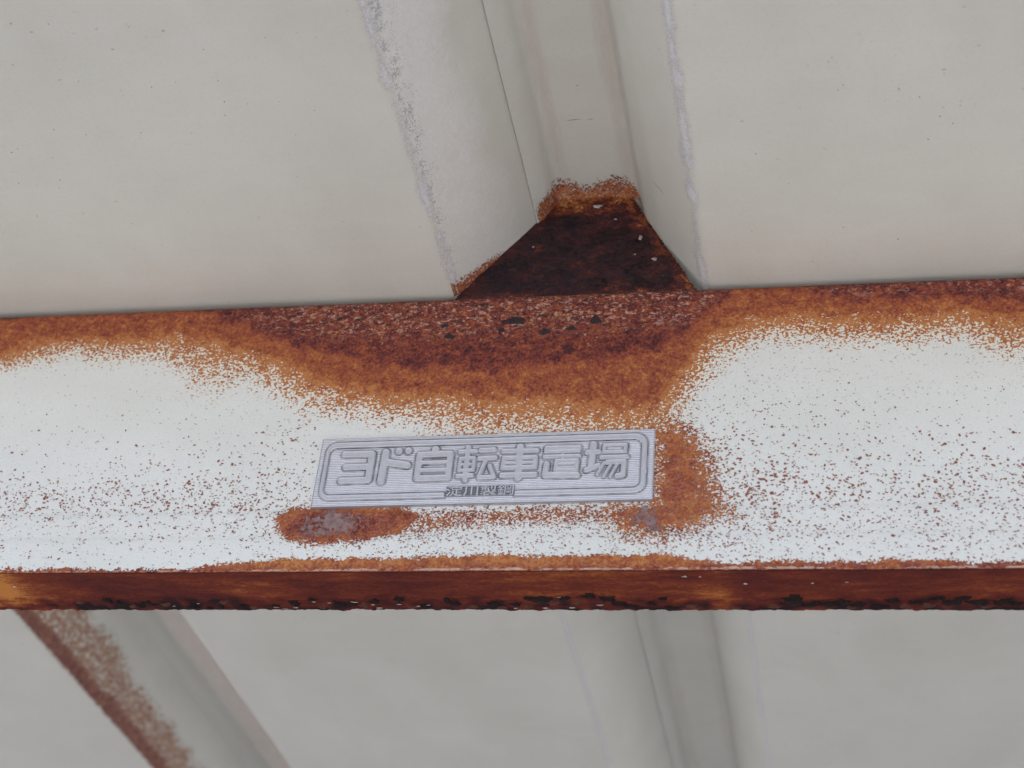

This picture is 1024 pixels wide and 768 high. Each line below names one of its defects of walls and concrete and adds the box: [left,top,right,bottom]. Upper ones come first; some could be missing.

corrosion [536,174,643,221]
corrosion [0,251,1024,578]
corrosion [102,598,171,608]
corrosion [187,598,381,611]
corrosion [393,593,698,610]
corrosion [768,594,1024,610]
corrosion [12,600,206,768]